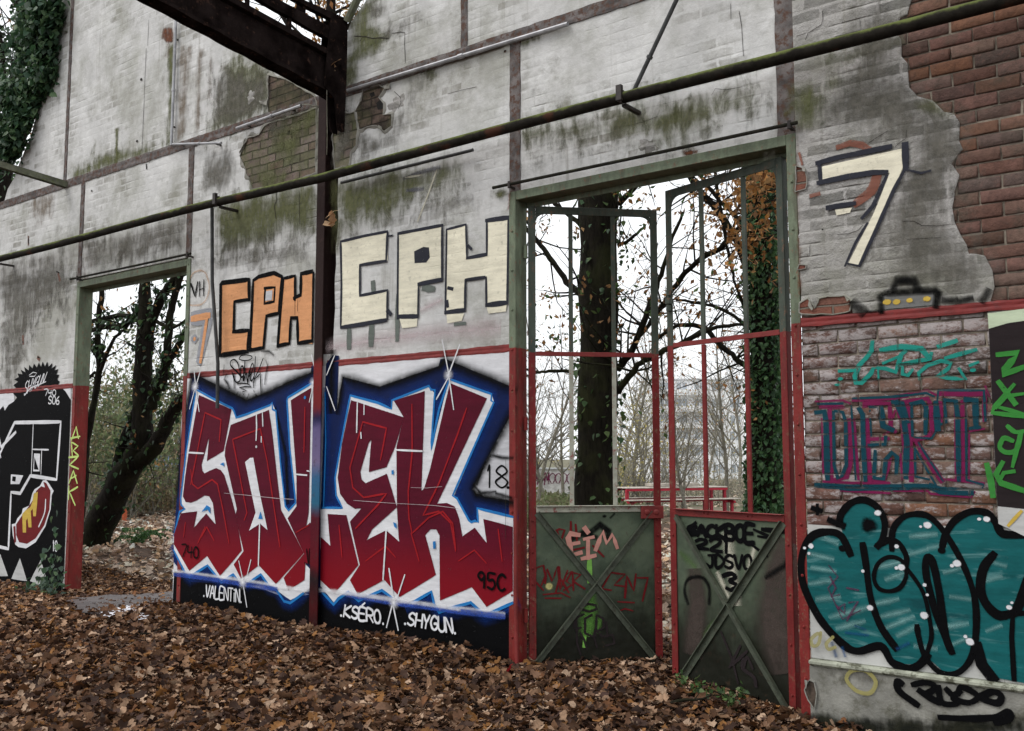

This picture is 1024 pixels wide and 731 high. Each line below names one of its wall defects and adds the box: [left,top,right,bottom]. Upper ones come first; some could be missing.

leakage [205,153,231,187]
leakage [214,72,265,121]
spalling [239,72,319,190]
spalling [331,83,394,169]
leakage [220,237,298,265]
flaking render [792,0,1024,535]